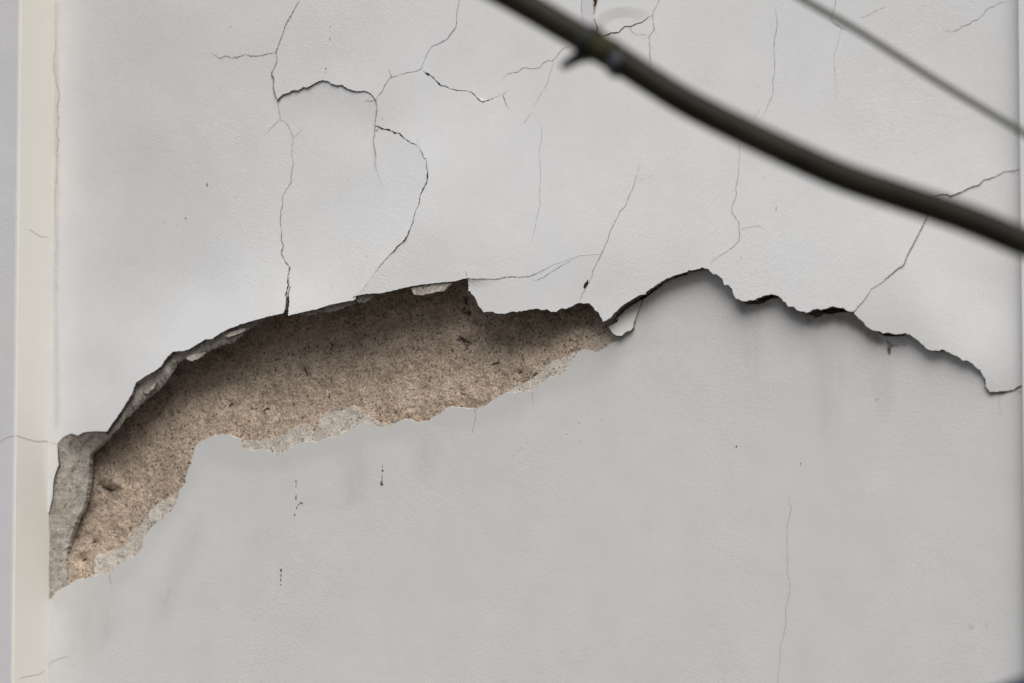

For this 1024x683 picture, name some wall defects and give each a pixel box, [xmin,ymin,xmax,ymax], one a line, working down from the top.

crack [581,0,659,63]
crack [205,0,567,289]
crack [466,164,652,299]
crack [637,146,761,314]
crack [745,295,779,304]
crack [809,221,925,318]
flaking render [49,279,640,598]